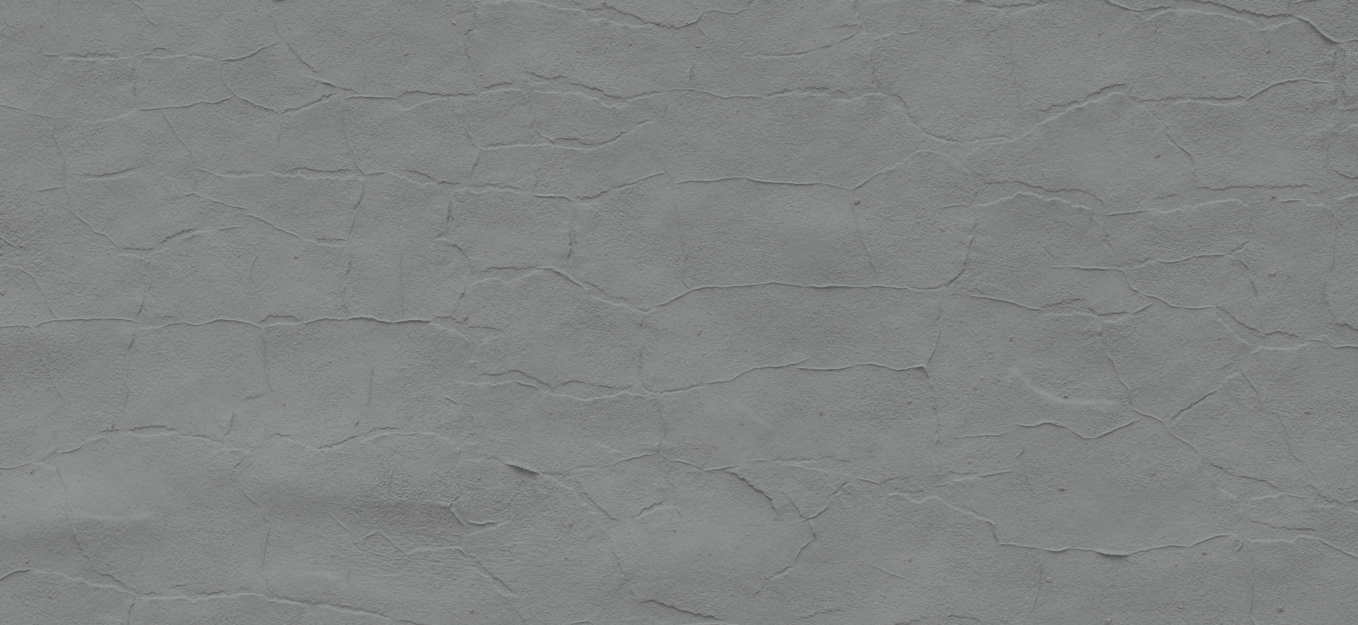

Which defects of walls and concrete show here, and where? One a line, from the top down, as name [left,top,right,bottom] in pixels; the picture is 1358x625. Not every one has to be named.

crack [0,0,1334,363]
crack [454,356,908,403]
crack [944,224,1358,561]
crack [0,393,501,471]
crack [543,440,1036,525]
crack [0,568,434,625]
crack [326,512,528,625]
crack [569,599,738,625]
crack [753,541,812,601]
crack [893,614,989,625]